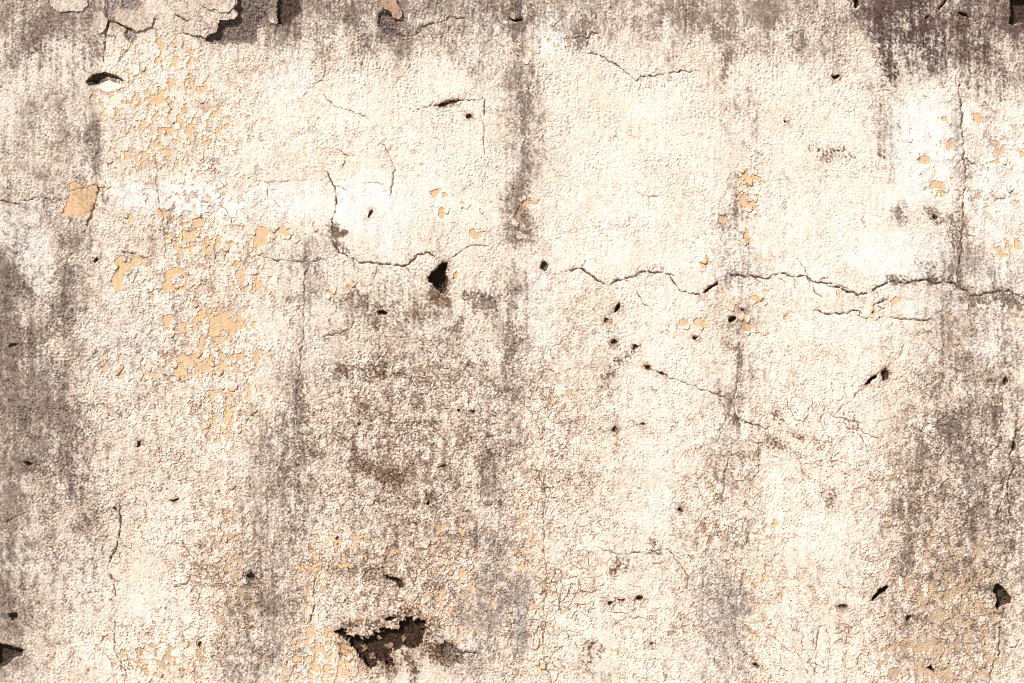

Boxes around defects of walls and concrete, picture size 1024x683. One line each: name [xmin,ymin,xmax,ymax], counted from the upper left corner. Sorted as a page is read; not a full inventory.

water stain [0,0,114,69]
flaking render [49,0,302,172]
water stain [503,0,1024,248]
water stain [0,218,91,676]
peeling [137,208,324,449]
crack [194,149,485,406]
spalling [428,263,458,294]
crack [561,260,698,307]
water stain [717,305,749,427]
crack [648,85,1024,547]
water stain [914,206,1018,382]
flaking render [279,508,513,683]